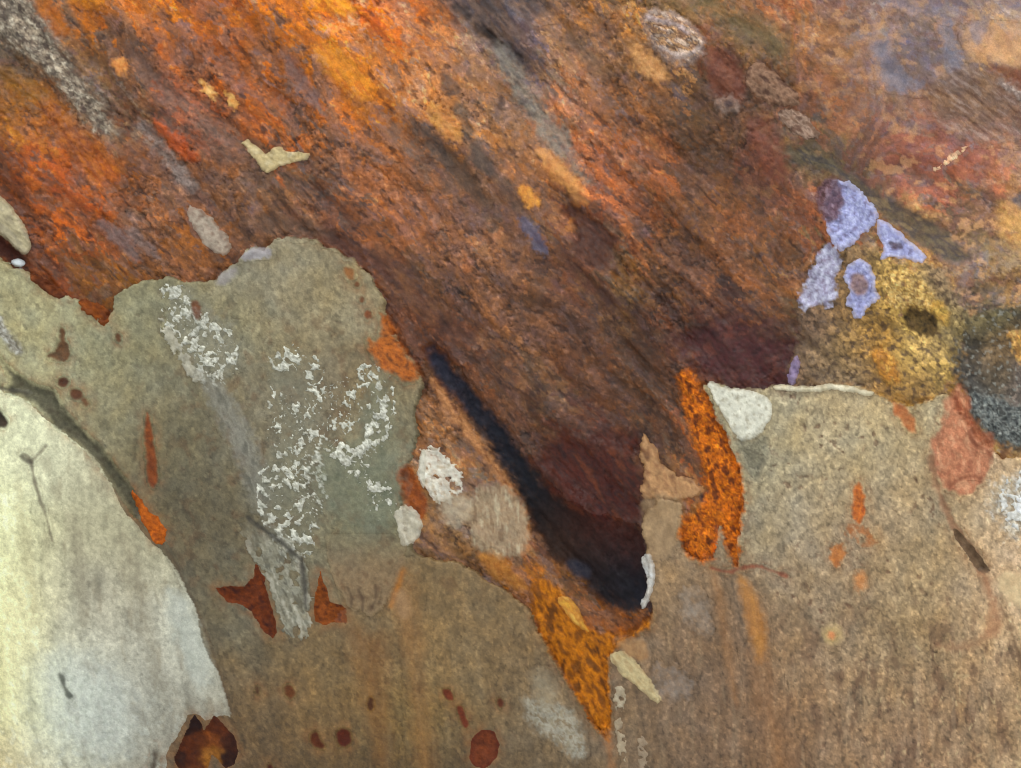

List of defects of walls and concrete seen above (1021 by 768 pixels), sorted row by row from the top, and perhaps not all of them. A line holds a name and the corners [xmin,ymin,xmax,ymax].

peeling [241,139,310,173]
peeling [0,196,31,268]
rust [0,0,1021,567]
peeling [796,174,927,319]
peeling [158,206,535,641]
peeling [707,355,874,485]
water stain [782,239,1021,549]
peeling [924,382,998,499]
peeling [636,433,702,609]
rust [827,479,881,597]
rust [408,466,657,768]
peeling [174,715,238,768]